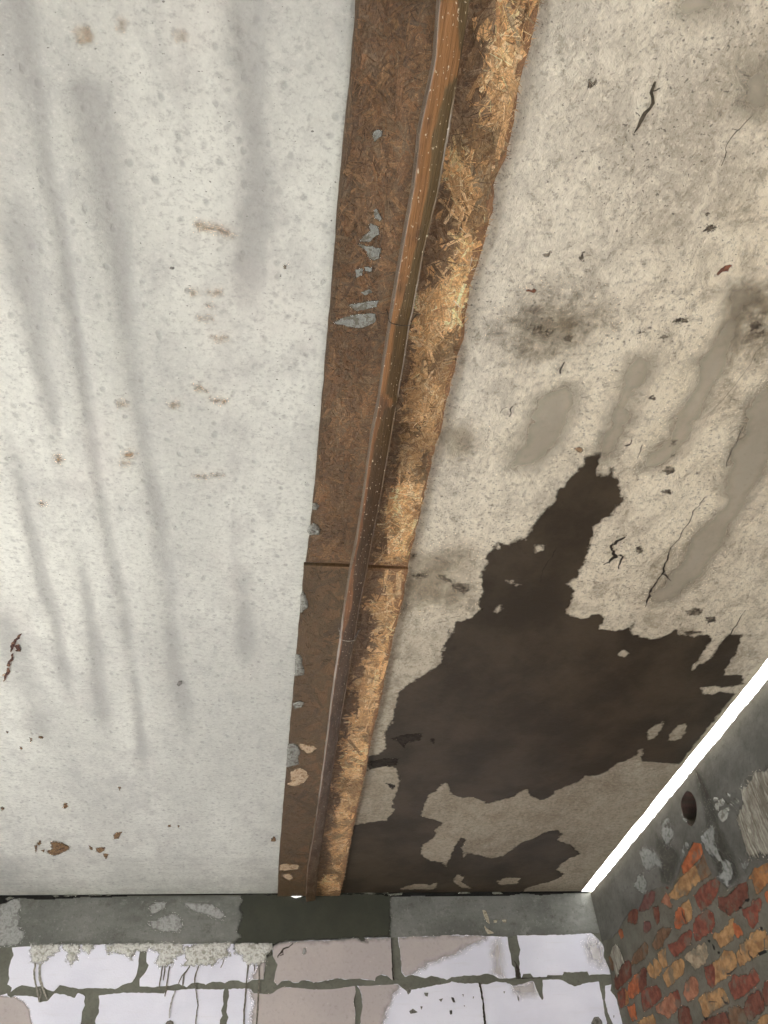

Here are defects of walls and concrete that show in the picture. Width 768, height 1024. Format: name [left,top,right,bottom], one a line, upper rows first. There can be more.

crack [634,81,660,133]
crack [603,537,626,569]
crack [645,497,705,607]
damp [234,358,744,1024]
spalling [681,792,697,826]
flaking render [713,768,768,859]
flaking render [610,944,624,977]